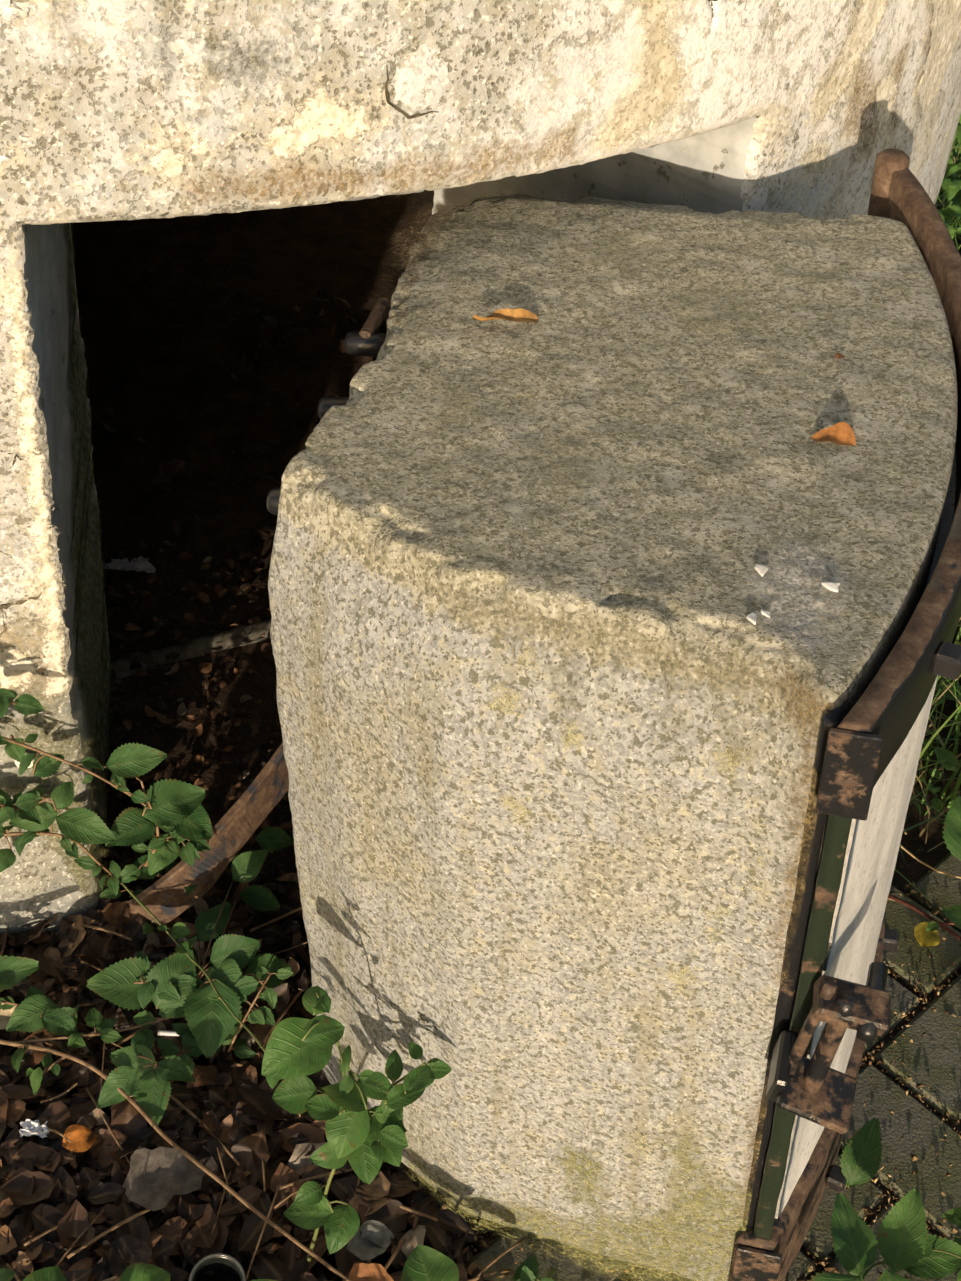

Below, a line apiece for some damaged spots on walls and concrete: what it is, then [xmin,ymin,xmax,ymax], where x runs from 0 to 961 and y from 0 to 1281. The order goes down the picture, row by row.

crack [0,592,43,635]